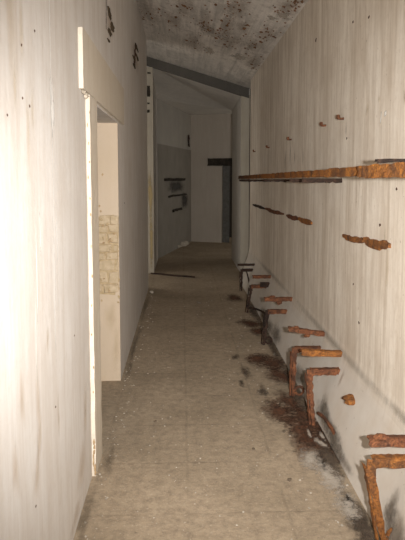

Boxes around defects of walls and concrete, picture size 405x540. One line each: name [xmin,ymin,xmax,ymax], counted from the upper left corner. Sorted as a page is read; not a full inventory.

corrosion [246,355,292,383]
corrosion [261,393,340,462]